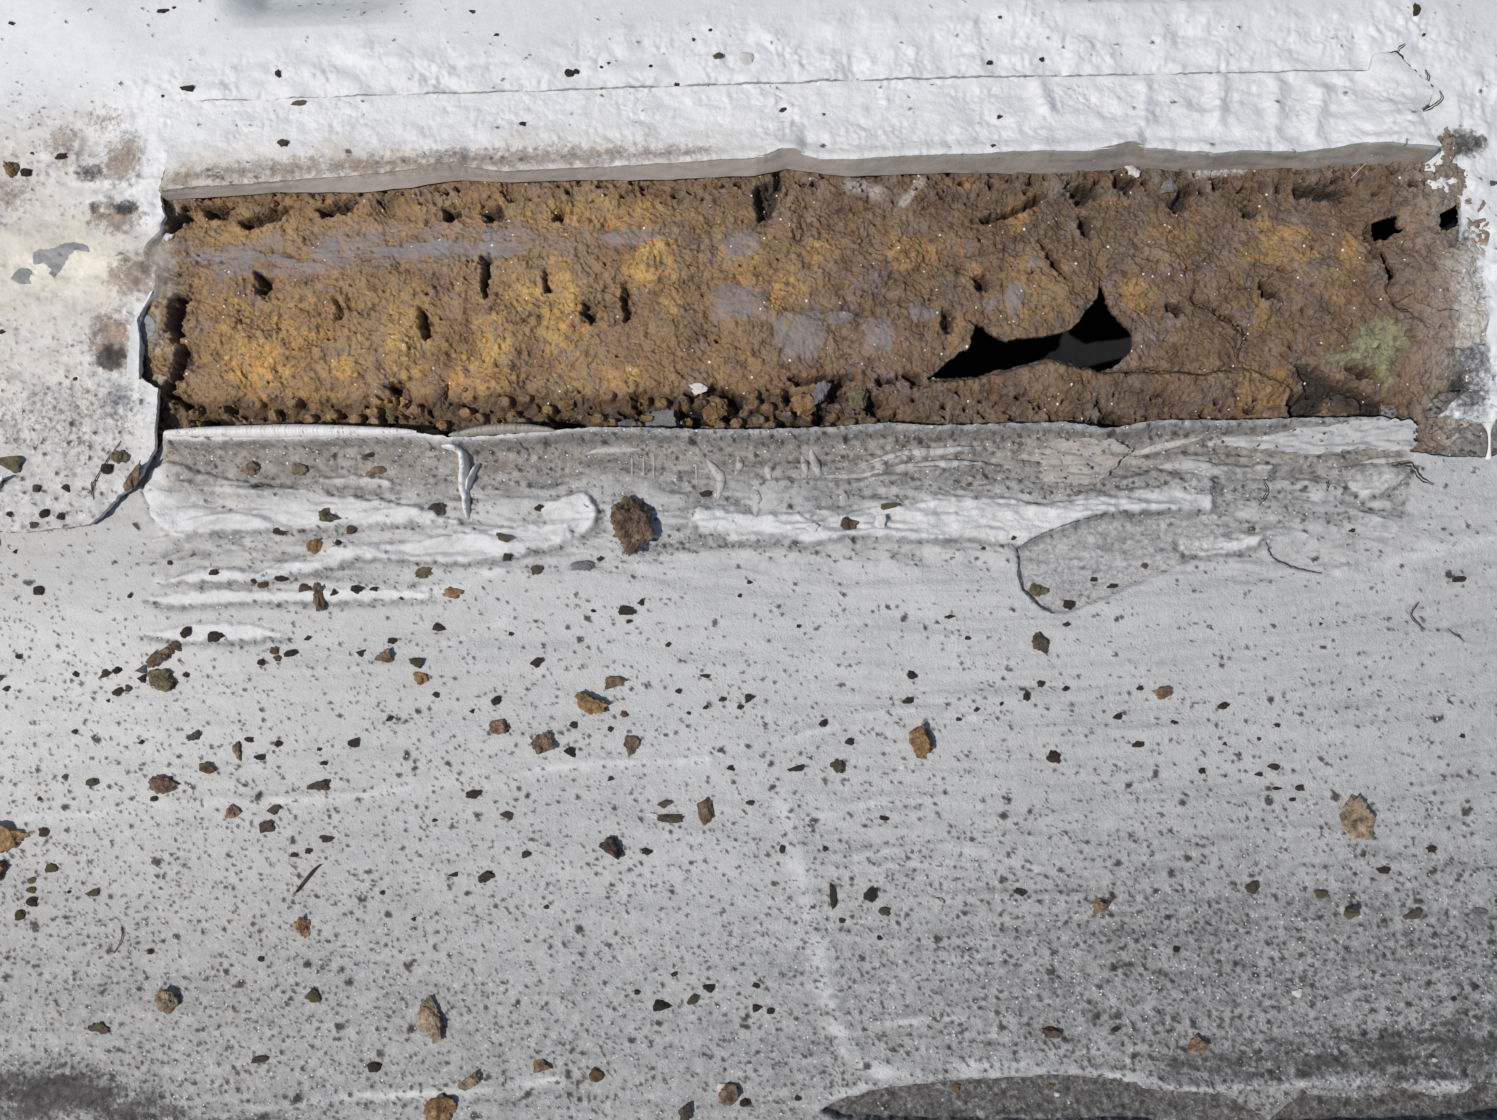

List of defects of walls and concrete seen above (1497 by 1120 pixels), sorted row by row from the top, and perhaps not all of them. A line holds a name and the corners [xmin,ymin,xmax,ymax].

peeling [1125,166,1141,178]
crack [1017,513,1108,613]